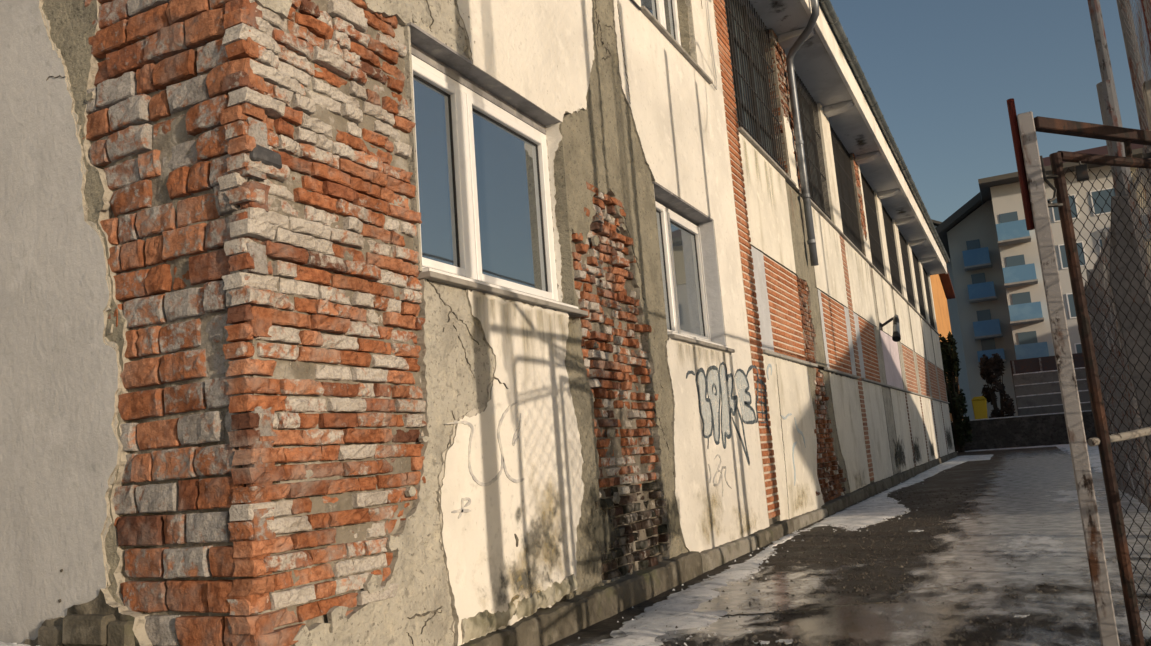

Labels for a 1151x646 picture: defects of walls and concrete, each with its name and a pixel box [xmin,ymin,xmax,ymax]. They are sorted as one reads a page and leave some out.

spalling [23,0,495,646]
damp [498,498,563,602]
crack [594,0,631,104]
spalling [545,0,688,601]
spalling [764,30,849,508]